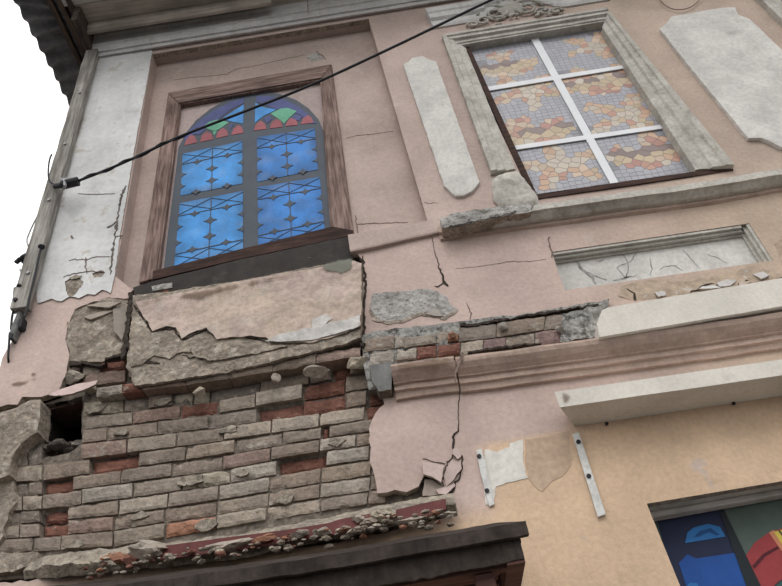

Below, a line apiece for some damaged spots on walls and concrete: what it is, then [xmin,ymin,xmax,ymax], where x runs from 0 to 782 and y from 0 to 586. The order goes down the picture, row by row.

crack [63,186,127,278]
peeling [66,275,83,299]
crack [432,236,553,288]
crack [576,249,725,284]
peeling [618,266,782,301]
flaking render [0,289,609,583]
crack [422,352,464,497]